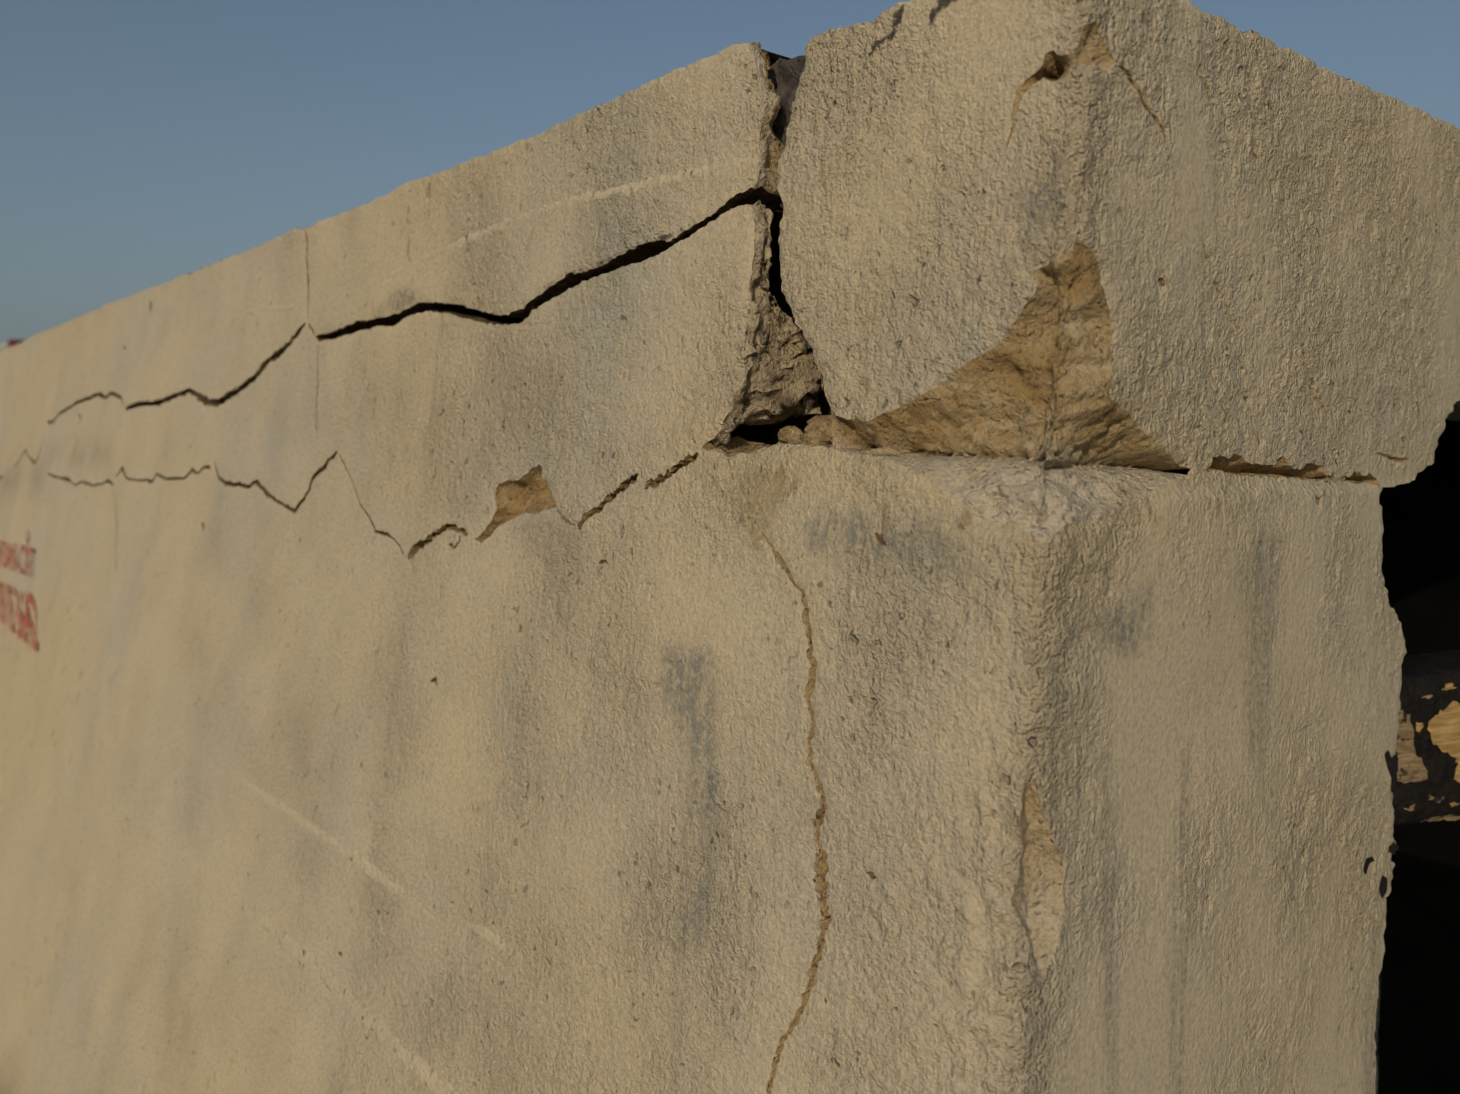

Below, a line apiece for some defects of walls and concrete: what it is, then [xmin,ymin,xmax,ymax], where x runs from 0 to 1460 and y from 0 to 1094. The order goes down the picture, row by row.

crack [1119,66,1167,140]
crack [0,42,833,574]
spalling [831,238,1188,543]
spalling [474,464,557,543]
crack [733,497,832,1094]
spalling [1011,783,1065,982]
peeling [1385,683,1460,822]